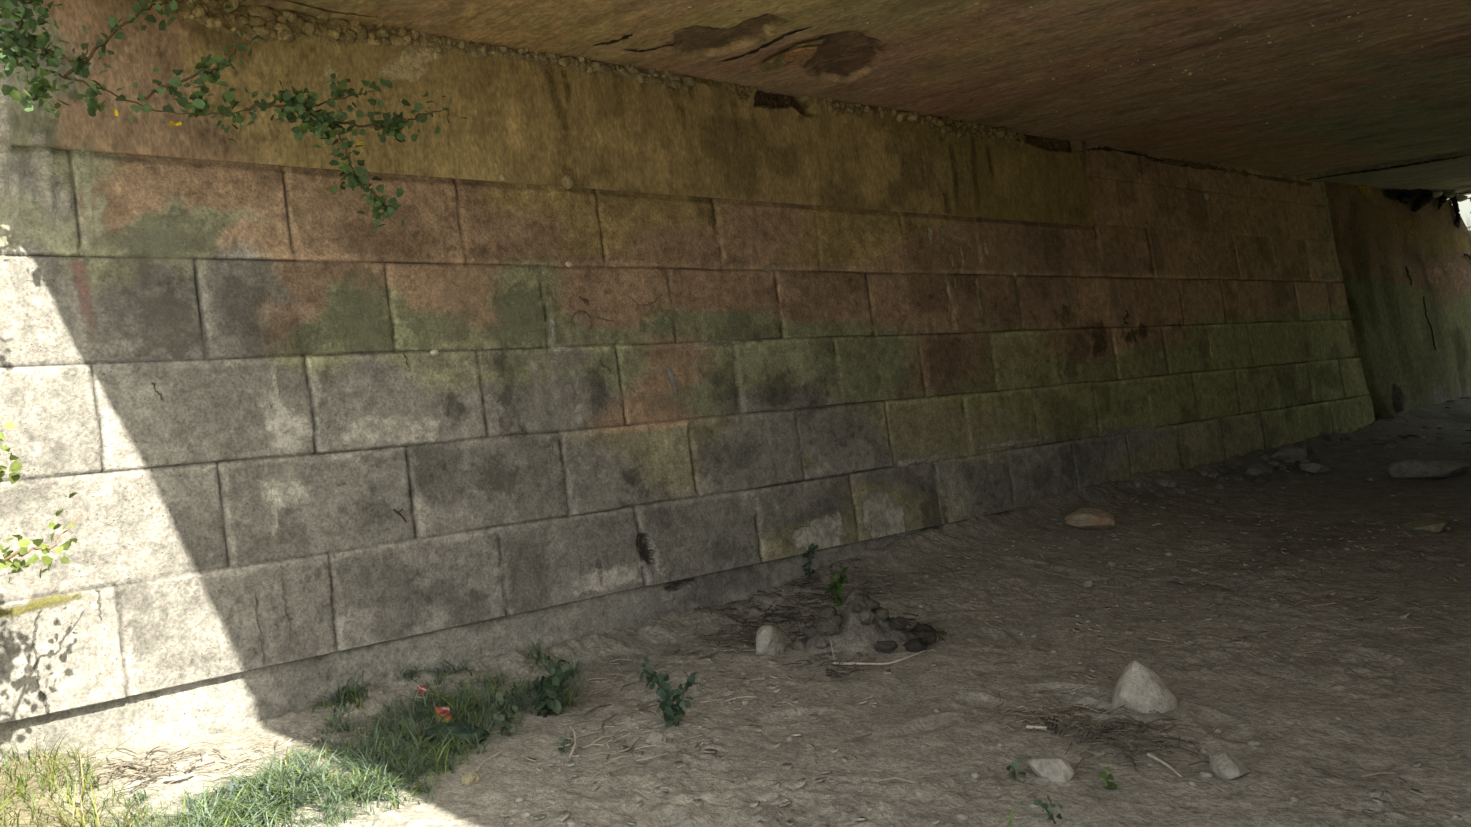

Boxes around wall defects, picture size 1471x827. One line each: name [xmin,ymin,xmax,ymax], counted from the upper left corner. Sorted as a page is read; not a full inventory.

spalling [154,0,929,125]
crack [32,609,50,713]